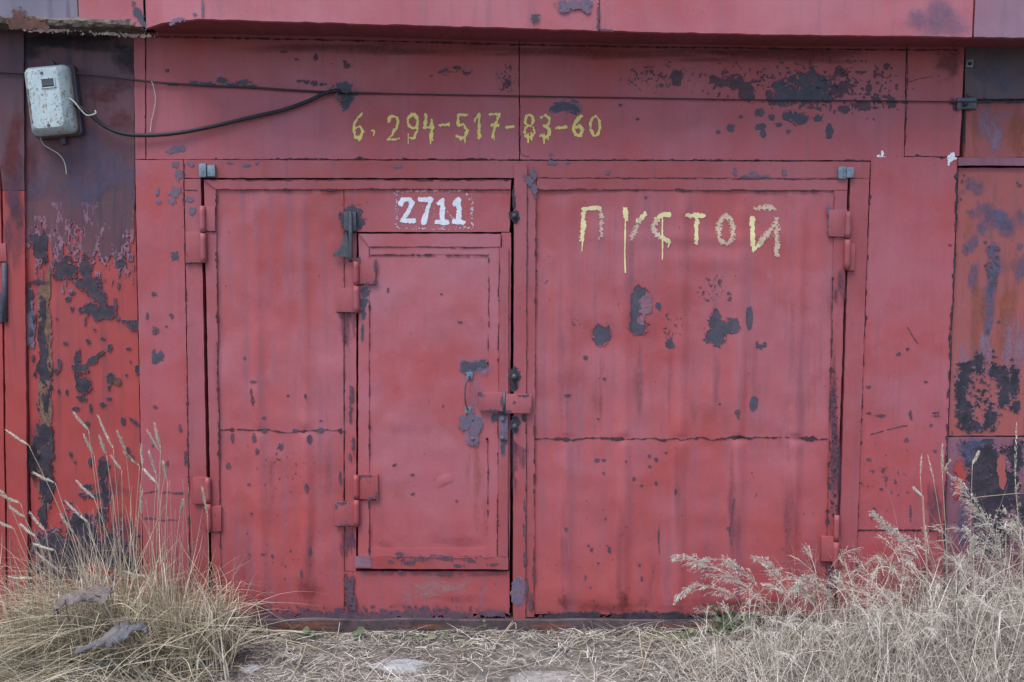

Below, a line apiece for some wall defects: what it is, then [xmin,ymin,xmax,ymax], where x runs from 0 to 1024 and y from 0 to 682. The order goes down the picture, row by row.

peeling [620,55,914,139]
peeling [26,202,174,590]
peeling [459,358,488,374]
peeling [458,366,532,456]
peeling [591,323,612,347]
peeling [628,283,682,348]
peeling [697,276,753,348]
peeling [952,320,1024,575]
peeling [380,552,498,568]